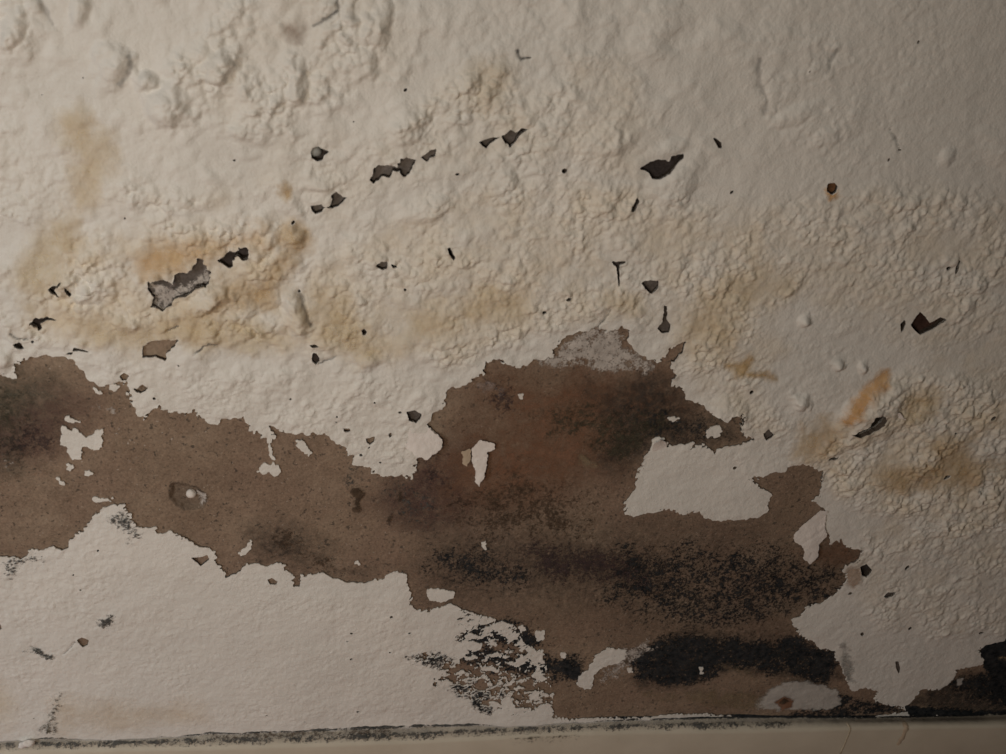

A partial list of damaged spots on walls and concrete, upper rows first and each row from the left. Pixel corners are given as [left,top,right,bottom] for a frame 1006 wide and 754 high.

peeling [149,258,210,309]
peeling [0,326,1006,719]
water stain [405,652,454,669]